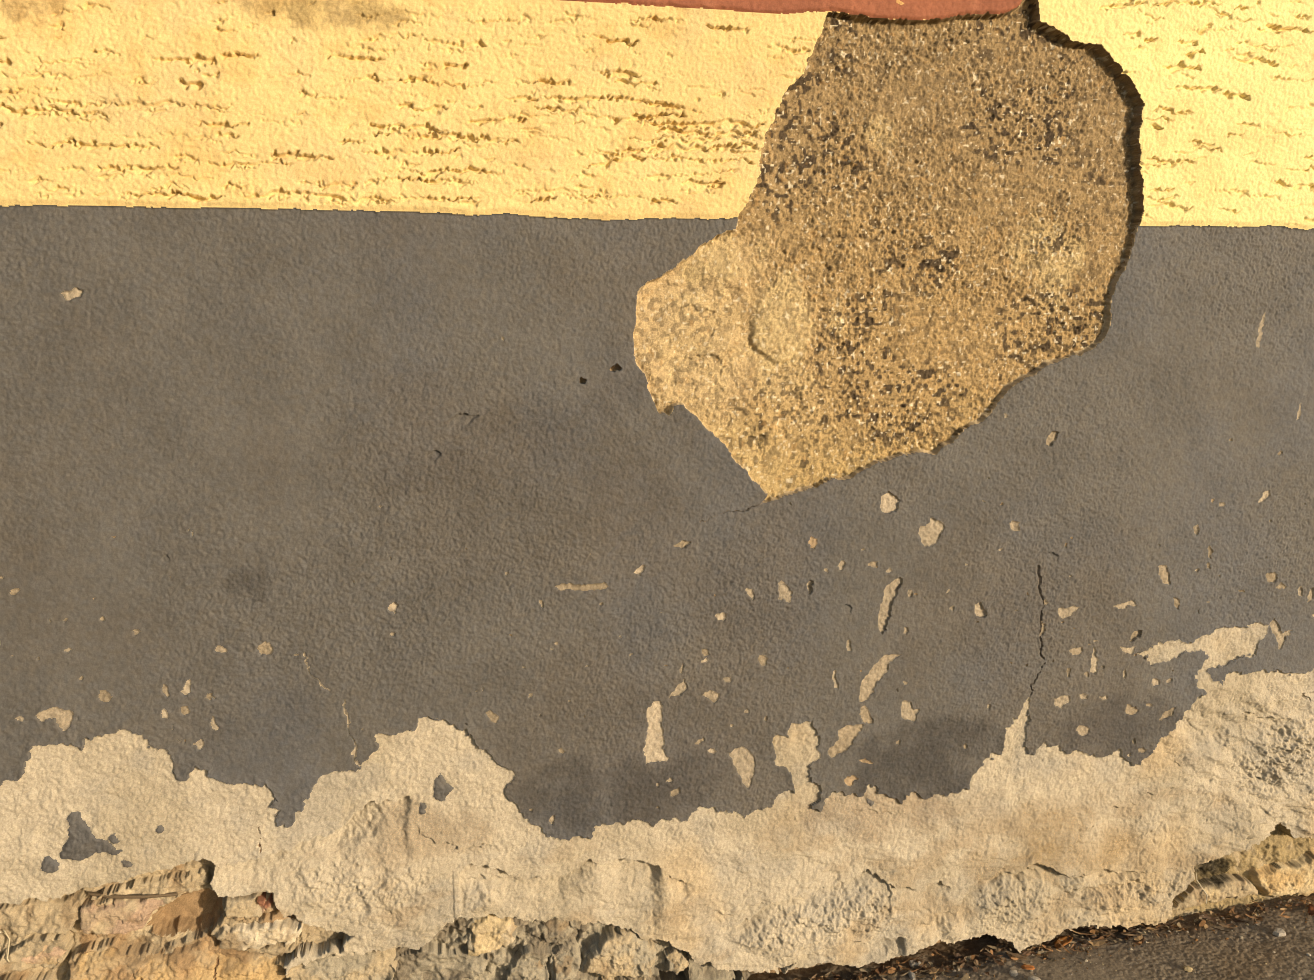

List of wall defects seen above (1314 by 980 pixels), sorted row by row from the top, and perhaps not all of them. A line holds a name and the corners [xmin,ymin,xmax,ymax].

flaking render [633,0,1145,513]
crack [1029,565,1046,696]
peeling [1040,600,1080,636]
peeling [0,618,1314,980]
crack [820,869,977,892]